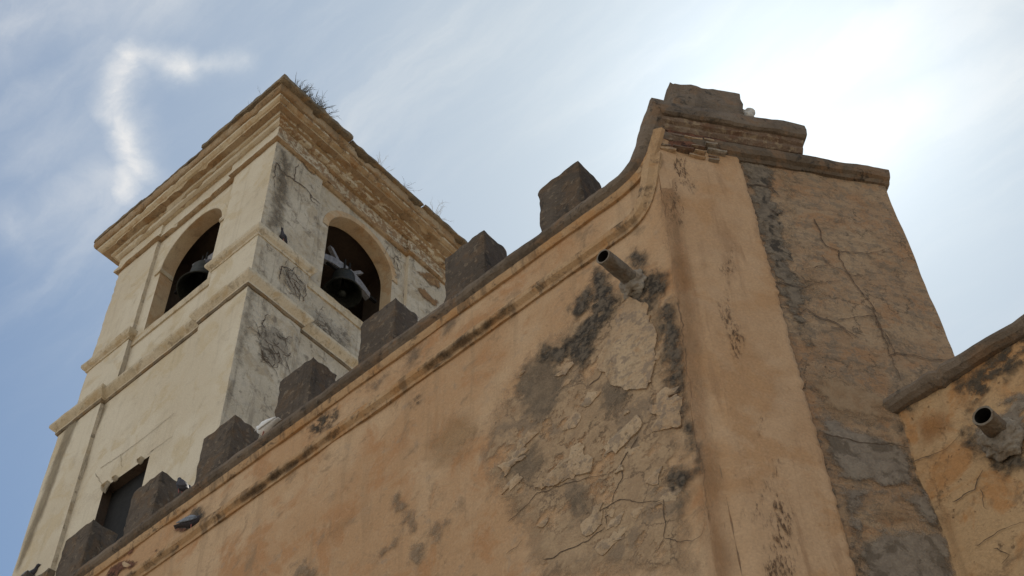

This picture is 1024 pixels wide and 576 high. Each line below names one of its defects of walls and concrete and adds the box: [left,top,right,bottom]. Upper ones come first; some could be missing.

damp [407,308,505,370]
damp [517,268,618,417]
damp [627,251,703,491]
crack [775,219,944,379]
damp [955,337,1024,403]
damp [242,452,309,500]
damp [311,409,338,439]
damp [510,447,541,481]
peeling [482,288,694,576]
crack [510,437,707,559]
damp [767,494,793,576]
damp [991,448,1024,474]